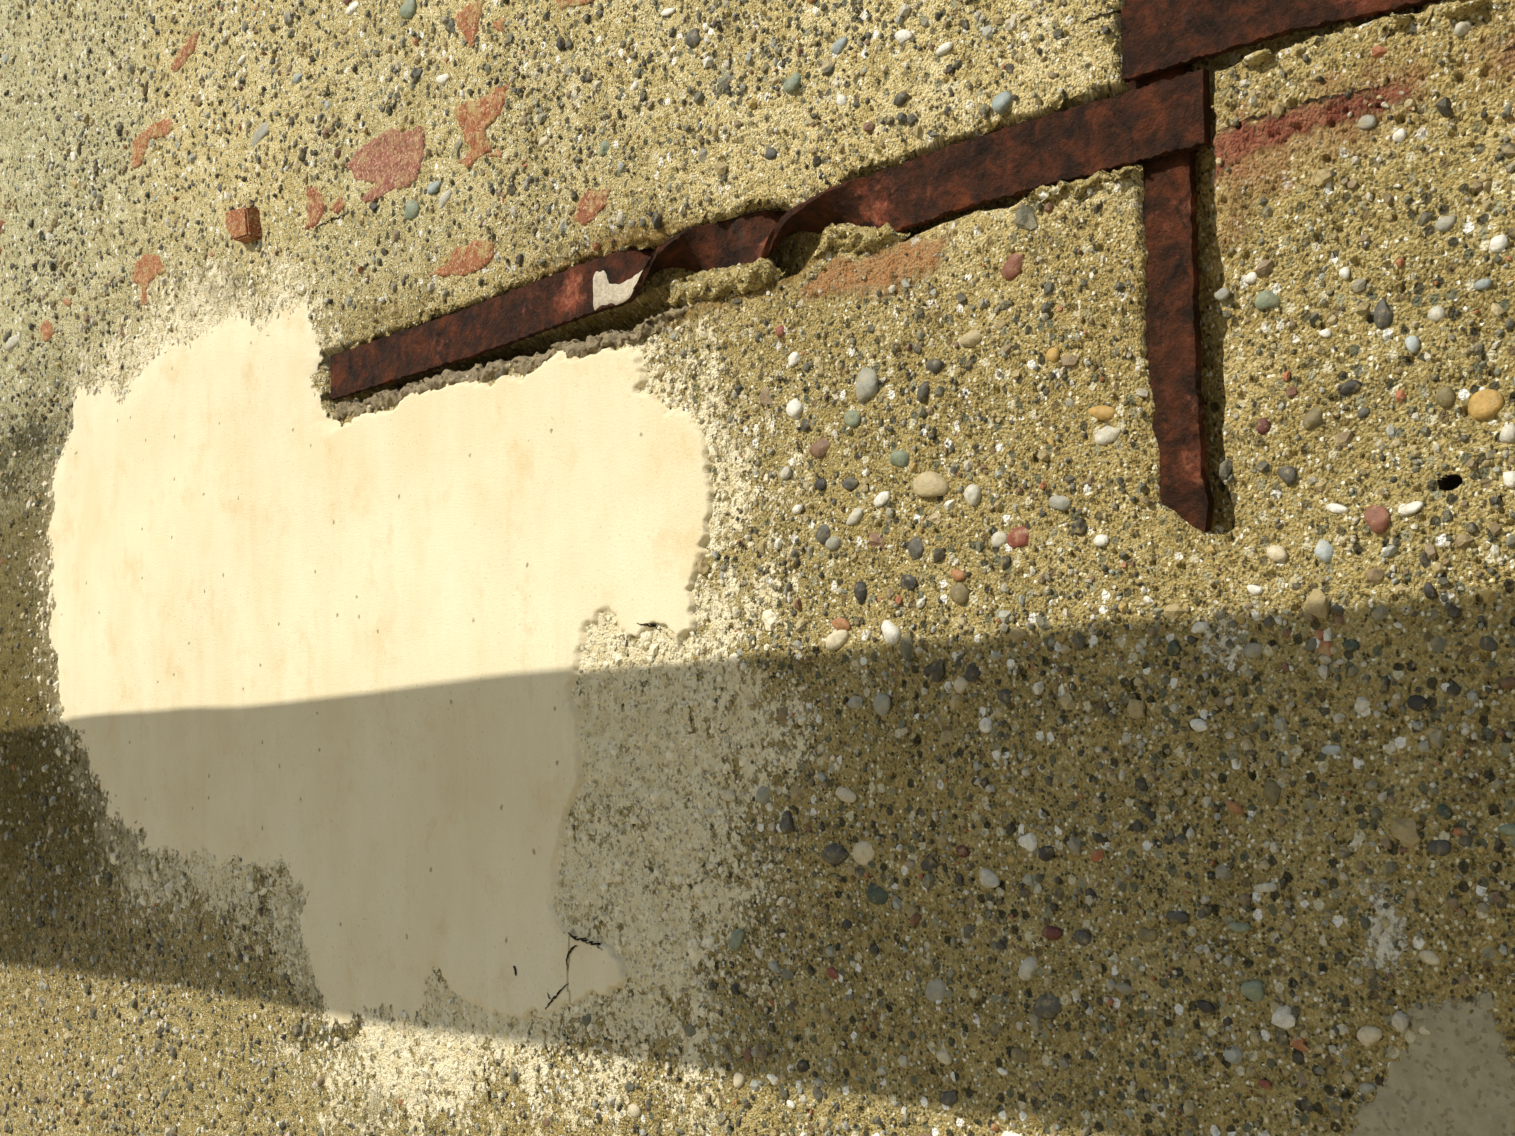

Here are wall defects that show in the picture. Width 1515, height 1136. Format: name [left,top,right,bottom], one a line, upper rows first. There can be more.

spalling [822,87,1085,192]
spalling [1024,165,1143,203]
rust [1213,78,1410,184]
spalling [346,193,798,349]
spalling [814,222,911,256]
rust [785,239,942,299]
spalling [333,257,788,421]
peeling [568,933,628,1005]